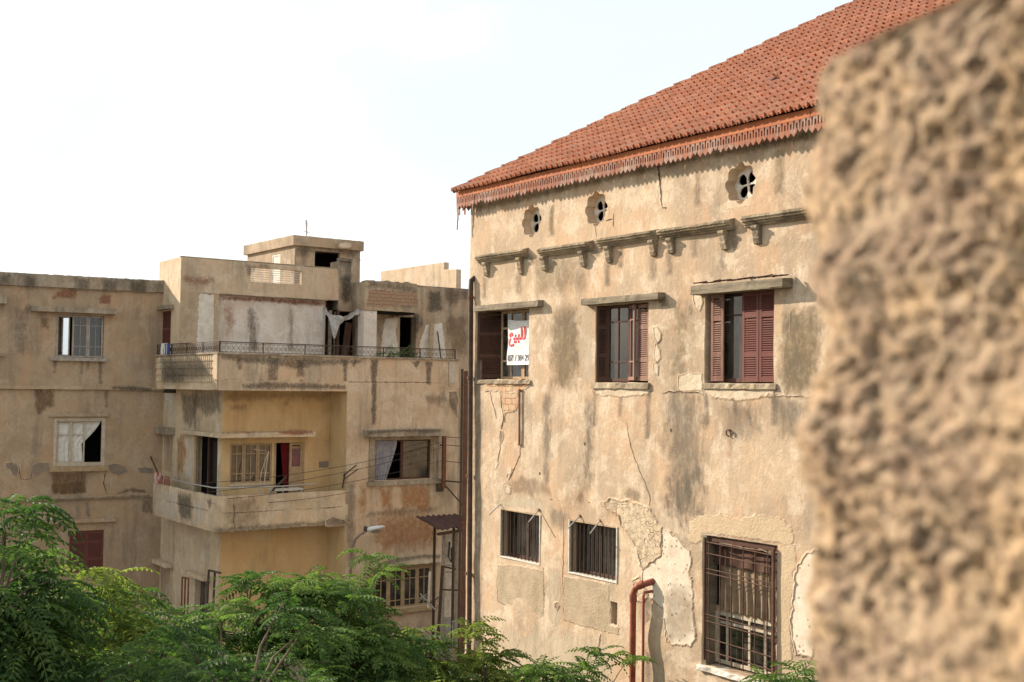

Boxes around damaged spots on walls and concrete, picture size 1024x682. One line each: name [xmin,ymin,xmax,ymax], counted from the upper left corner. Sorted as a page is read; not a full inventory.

damp [225,311,356,388]
damp [553,309,589,386]
damp [164,393,219,476]
crack [485,389,521,494]
flaking render [484,379,530,414]
crack [626,423,651,506]
damp [671,400,707,509]
flaking render [600,496,697,649]
flaking render [789,548,815,661]